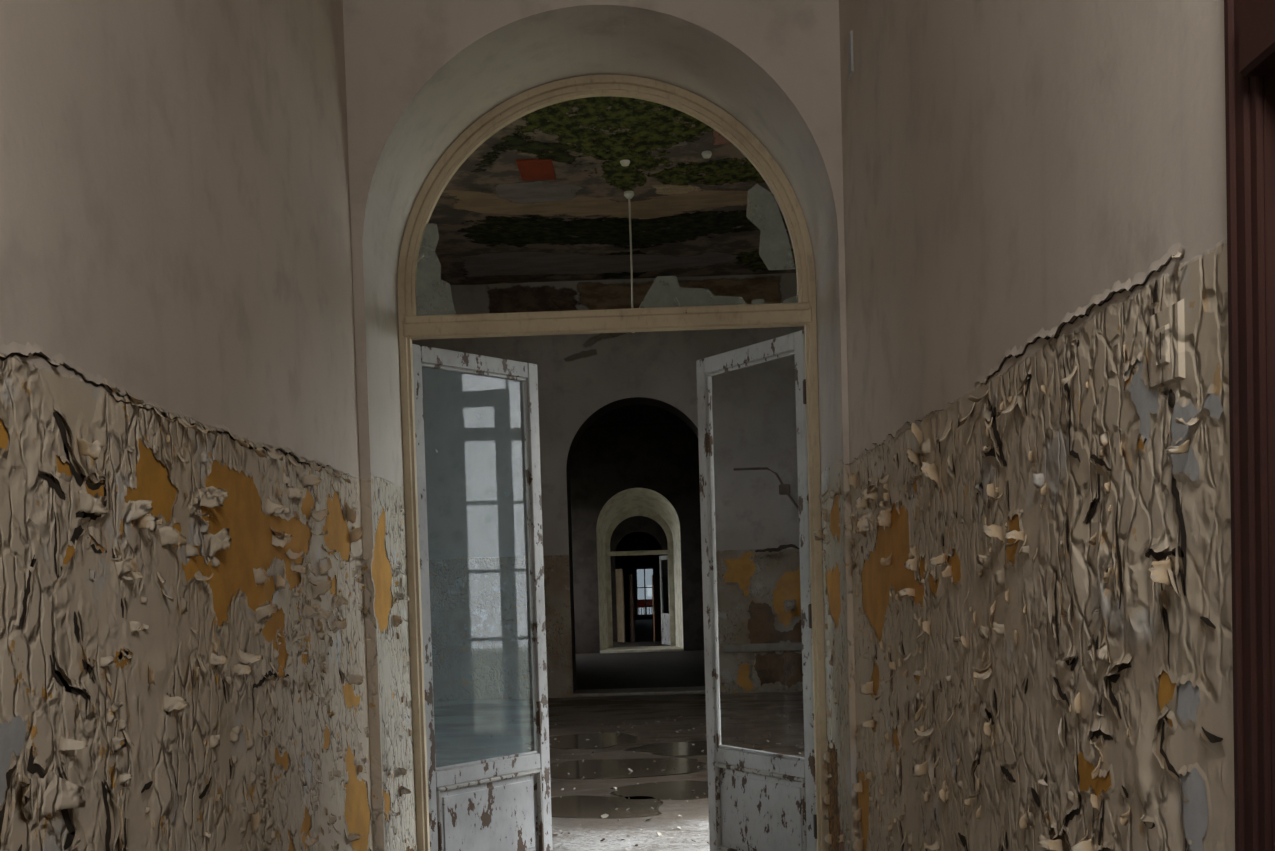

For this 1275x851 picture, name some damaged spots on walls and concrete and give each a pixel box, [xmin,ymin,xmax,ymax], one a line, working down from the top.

peeling [1099,344,1228,488]
peeling [1028,450,1046,511]
peeling [0,341,417,851]
spalling [720,549,803,693]
peeling [813,385,1038,851]
peeling [1096,637,1110,663]
peeling [1069,692,1081,717]
peeling [1066,739,1115,811]
spalling [1019,805,1116,851]